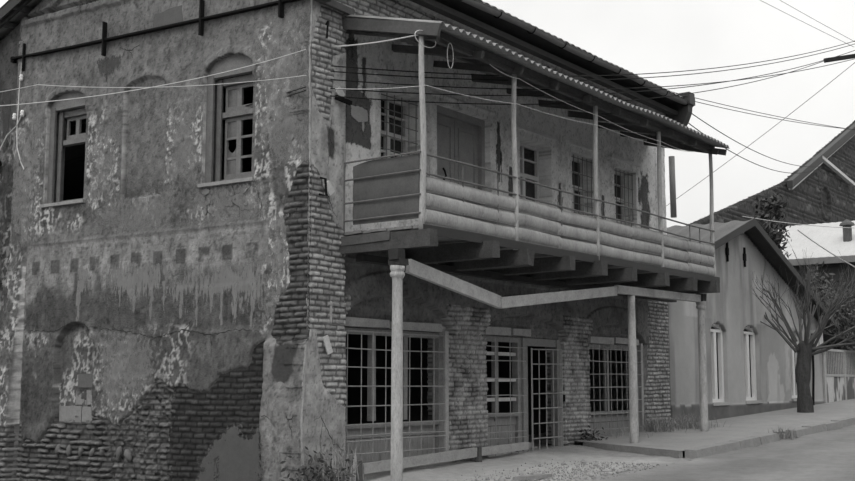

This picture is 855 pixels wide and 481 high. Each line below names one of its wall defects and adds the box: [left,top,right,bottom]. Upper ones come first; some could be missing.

flaking render [0,0,663,481]